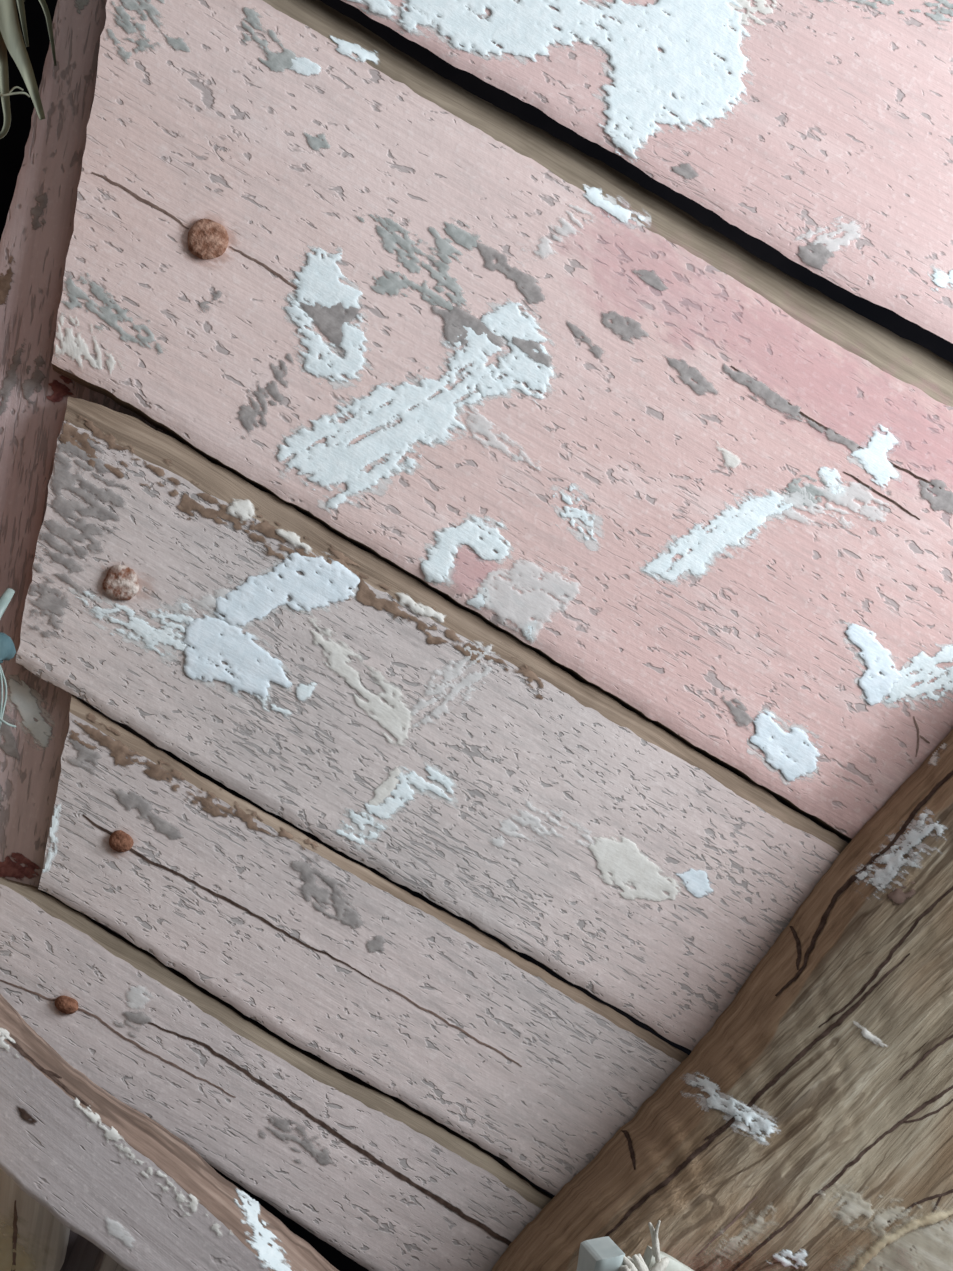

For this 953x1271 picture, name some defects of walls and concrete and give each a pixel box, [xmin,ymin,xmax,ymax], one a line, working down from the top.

crack [92,172,189,229]
crack [229,246,298,290]
peeling [297,300,360,358]
peeling [357,214,552,367]
peeling [24,415,544,699]
peeling [783,475,827,506]
crack [83,814,522,1067]
crack [0,980,511,1246]
crack [697,1196,758,1256]
crack [604,887,953,1237]
crack [733,1085,953,1271]